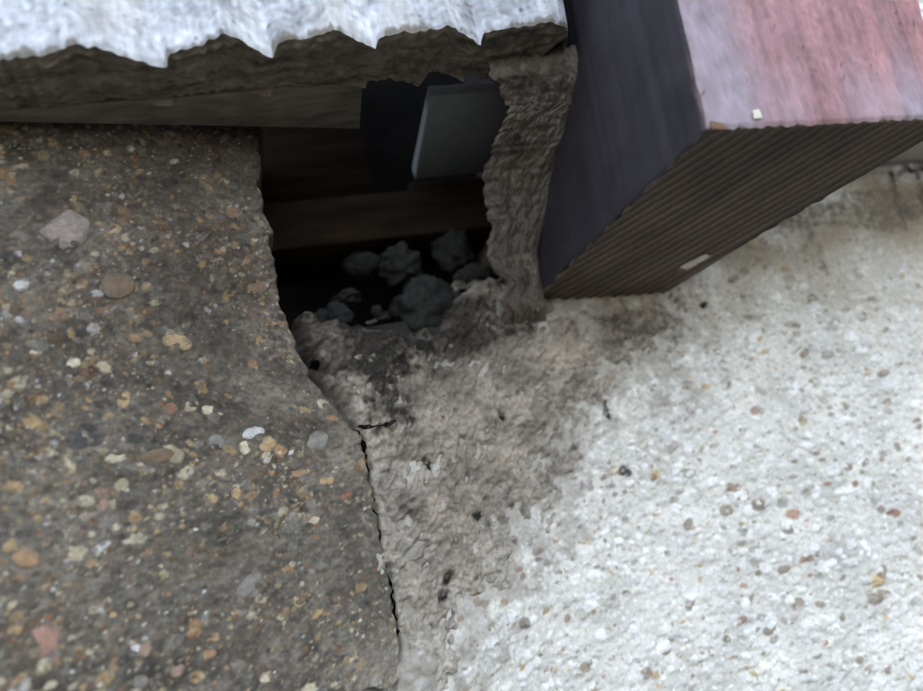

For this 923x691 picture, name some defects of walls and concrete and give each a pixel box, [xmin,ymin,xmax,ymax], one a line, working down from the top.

damp [339,297,535,429]
crack [351,419,396,474]
crack [386,566,400,636]